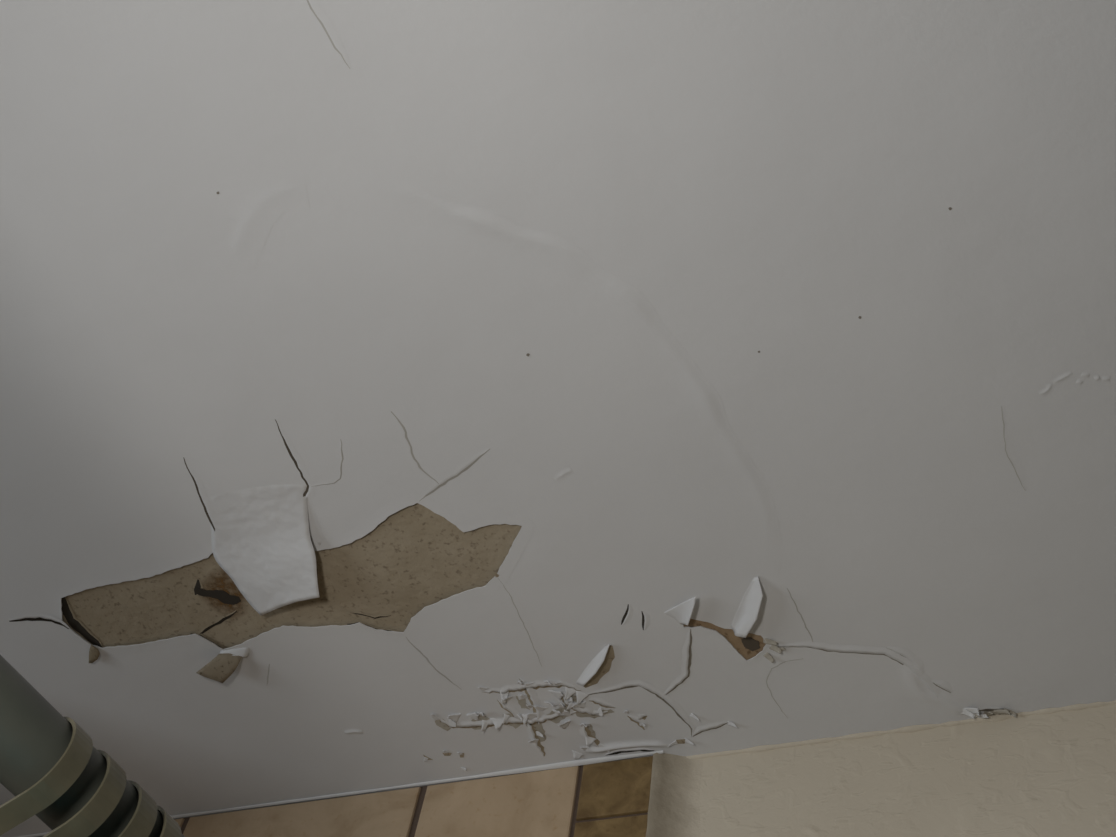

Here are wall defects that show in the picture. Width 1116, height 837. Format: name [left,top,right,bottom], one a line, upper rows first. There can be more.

crack [183,457,216,531]
crack [275,419,343,551]
crack [389,411,490,501]
peeling [50,485,534,683]
peeling [664,577,785,666]
peeling [430,644,648,759]